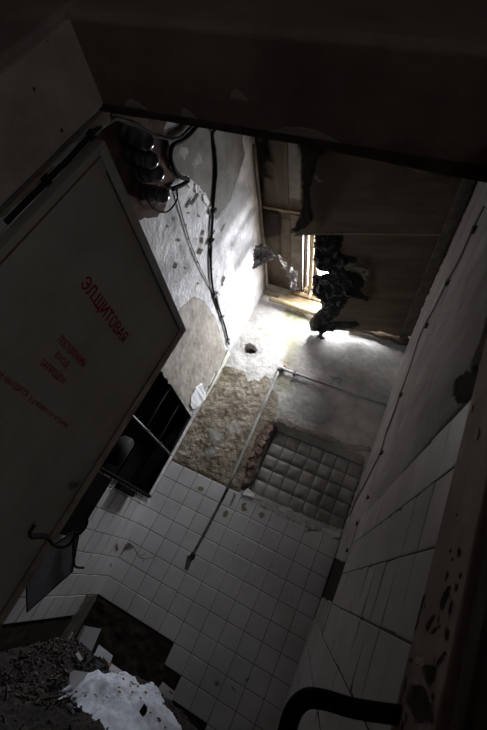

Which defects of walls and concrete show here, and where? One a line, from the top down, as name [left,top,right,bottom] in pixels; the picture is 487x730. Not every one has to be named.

spalling [161,297,371,499]
spalling [455,366,479,412]
peeling [414,571,463,641]
peeling [0,594,207,730]
peeling [400,651,447,730]